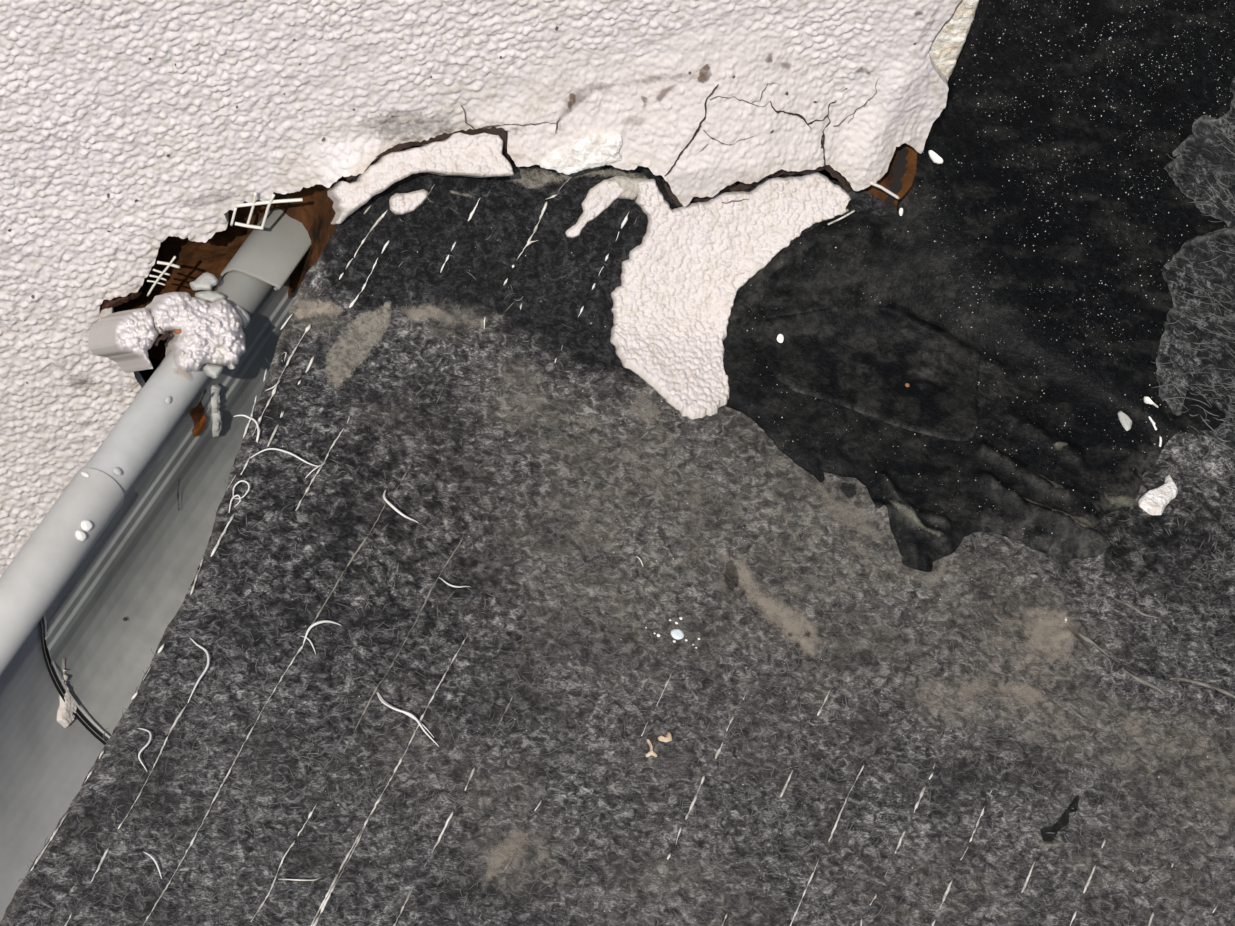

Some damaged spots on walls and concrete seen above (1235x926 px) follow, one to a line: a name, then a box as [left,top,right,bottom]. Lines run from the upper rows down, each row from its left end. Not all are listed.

flaking render [540,133,622,175]
crack [664,80,878,206]
spalling [846,143,918,209]
spalling [113,132,514,328]
rust [100,289,142,310]
spalling [147,329,182,361]
flaking render [201,364,235,379]
rust [189,389,207,437]
water stain [818,483,881,541]
water stain [892,501,939,536]
water stain [1105,495,1134,507]